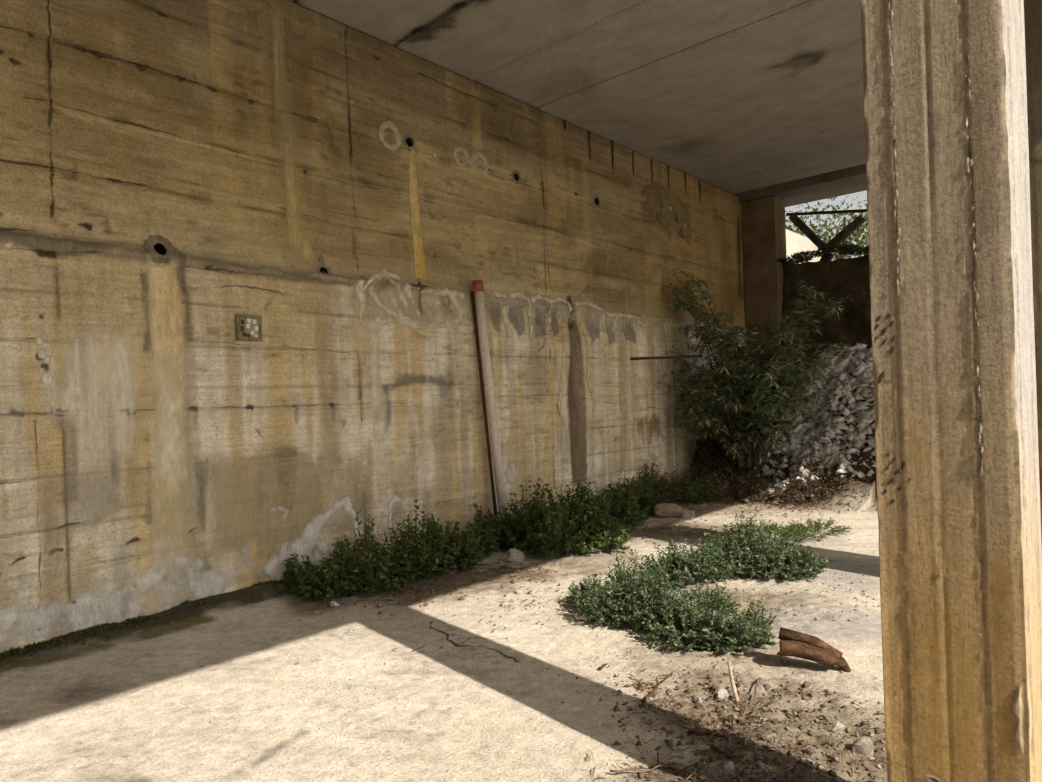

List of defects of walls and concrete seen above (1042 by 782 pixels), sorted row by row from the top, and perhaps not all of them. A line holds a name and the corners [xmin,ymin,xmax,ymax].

crack [0,0,52,70]
crack [76,45,218,92]
crack [133,0,180,21]
damp [399,0,488,42]
crack [0,98,171,217]
damp [285,140,315,261]
damp [0,251,363,664]
crack [412,622,519,662]
spalling [1012,684,1032,752]